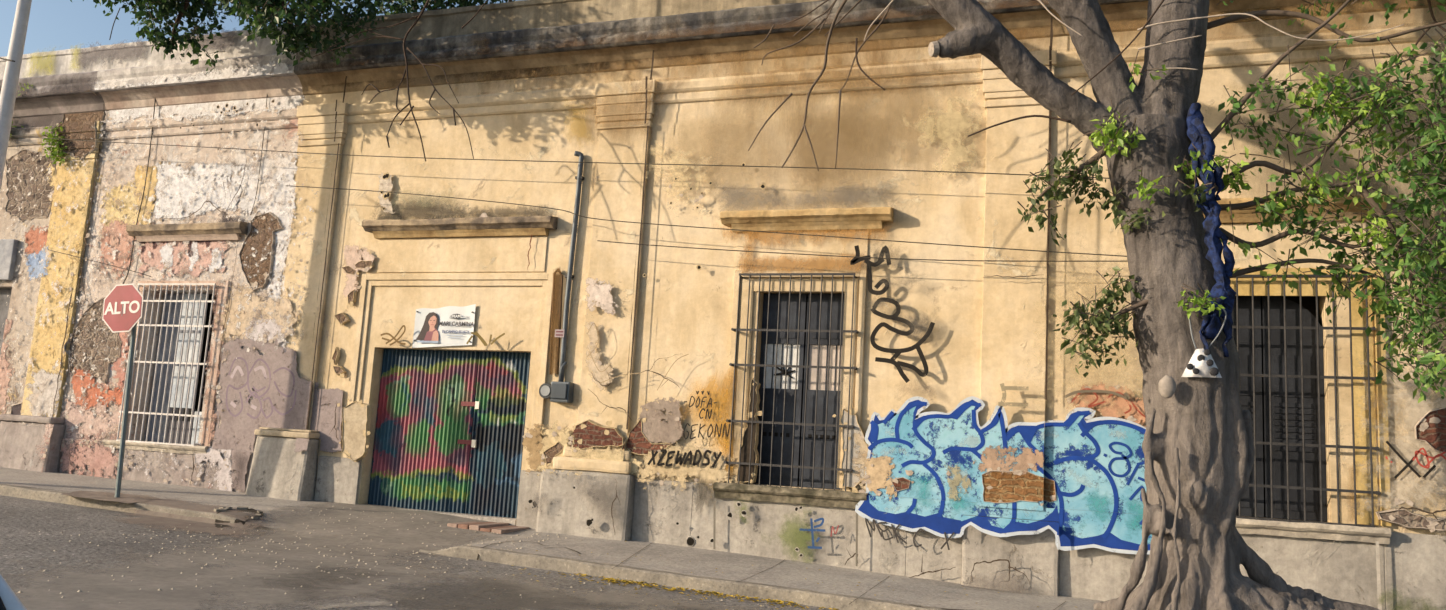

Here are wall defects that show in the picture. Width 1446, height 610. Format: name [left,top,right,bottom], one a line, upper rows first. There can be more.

peeling [85,60,293,95]
peeling [0,95,317,491]
peeling [585,277,619,391]
peeling [522,364,795,498]
flaking render [726,501,747,520]
flaking render [944,445,1056,506]
peeling [1351,365,1446,532]